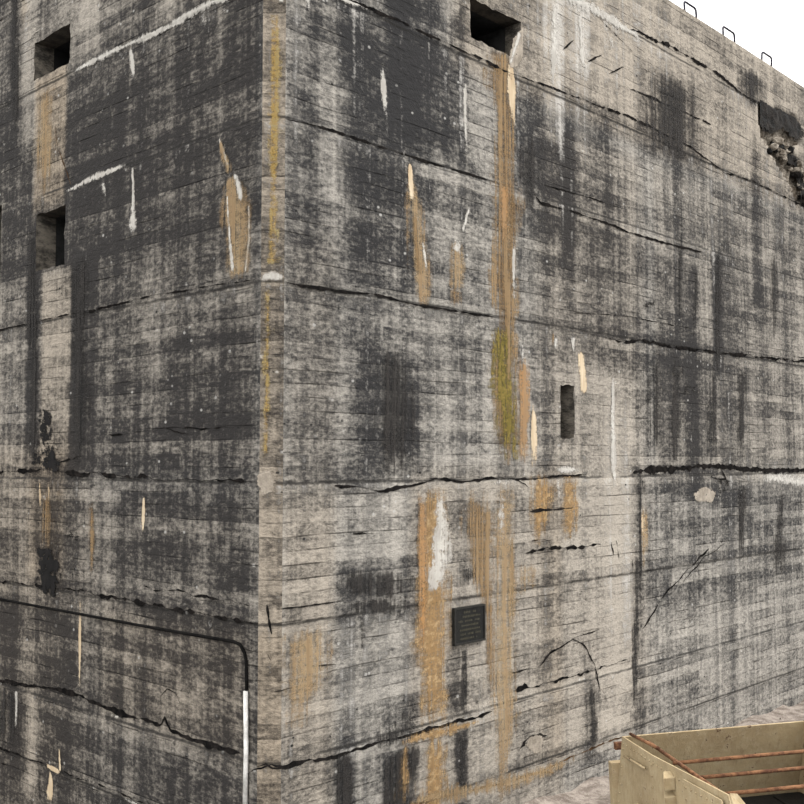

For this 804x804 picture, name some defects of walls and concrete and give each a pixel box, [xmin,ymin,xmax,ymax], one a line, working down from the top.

damp [76,0,225,75]
spalling [758,100,804,203]
rust [219,138,251,275]
rust [406,164,431,303]
rust [483,54,537,464]
rust [530,466,578,544]
crack [633,463,804,487]
damp [36,547,61,601]
rust [399,490,574,804]
crack [509,629,626,692]
crack [0,679,240,754]
crack [249,711,492,773]